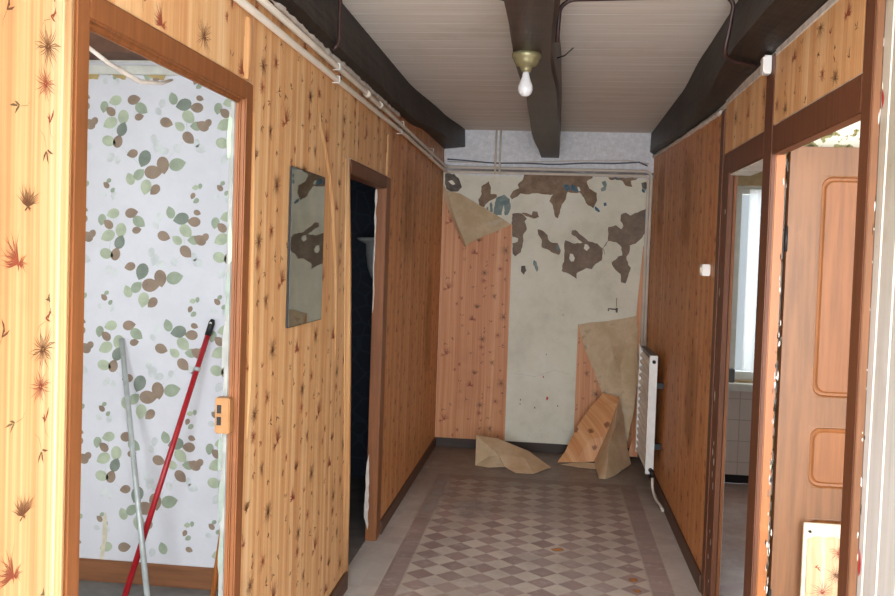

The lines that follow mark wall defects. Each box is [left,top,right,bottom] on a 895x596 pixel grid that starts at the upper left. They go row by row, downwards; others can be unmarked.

peeling [444,173,462,192]
peeling [478,175,647,284]